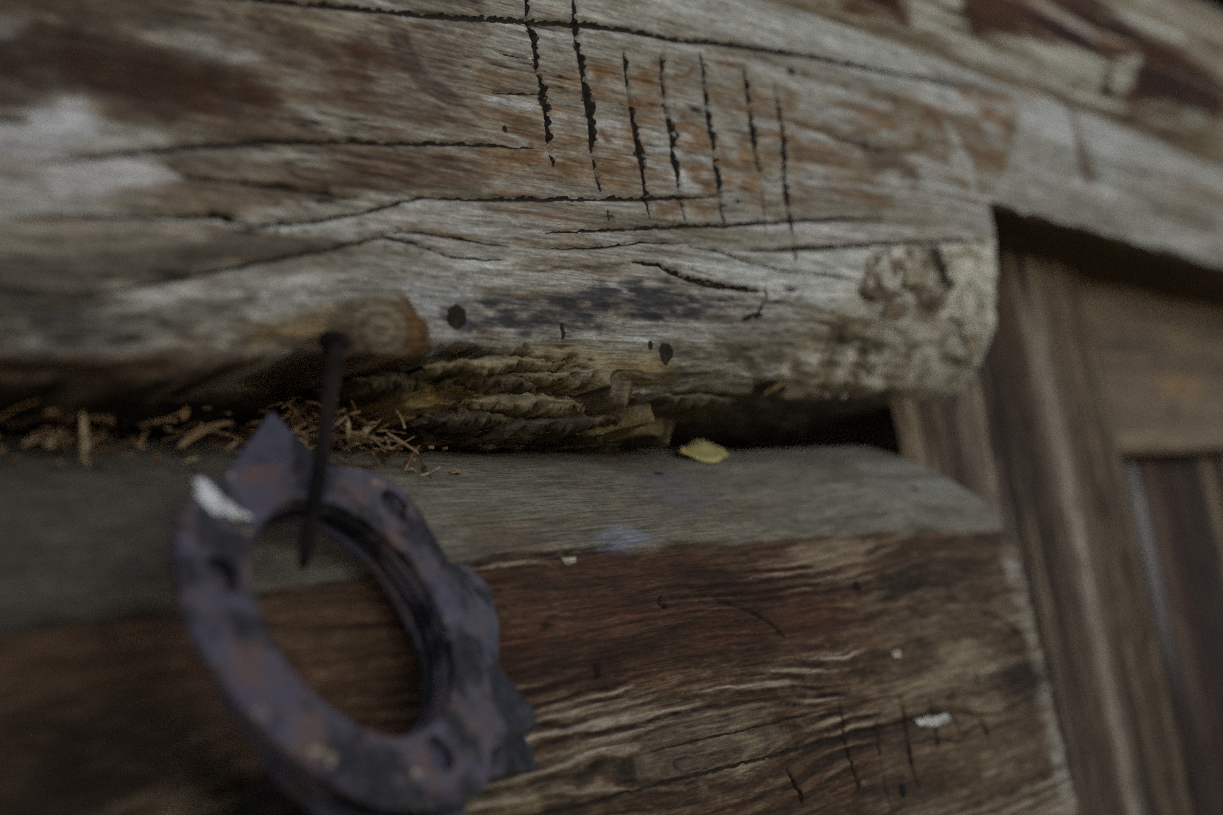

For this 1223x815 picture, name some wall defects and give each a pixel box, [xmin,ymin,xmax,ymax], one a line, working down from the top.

crack [0,138,985,322]